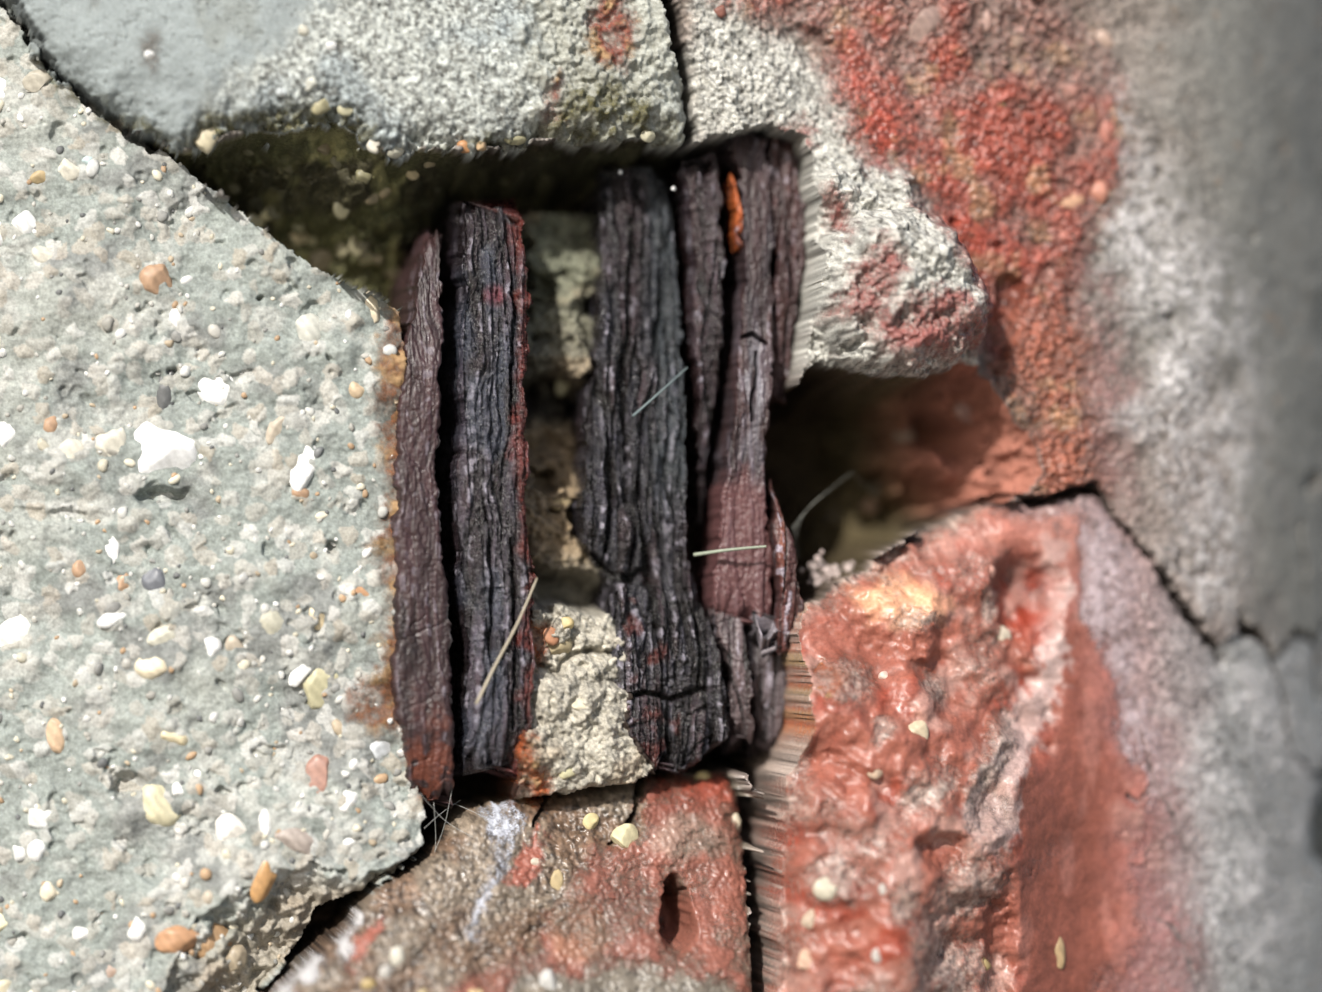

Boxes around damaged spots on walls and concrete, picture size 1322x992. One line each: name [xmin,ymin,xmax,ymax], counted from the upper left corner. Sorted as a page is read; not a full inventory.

crack [0,0,160,156]
crack [661,0,699,157]
rust [348,198,549,817]
rust [566,133,839,776]
peeling [455,0,1200,992]
crack [897,480,1322,779]
crack [257,819,448,992]
crack [704,748,789,992]